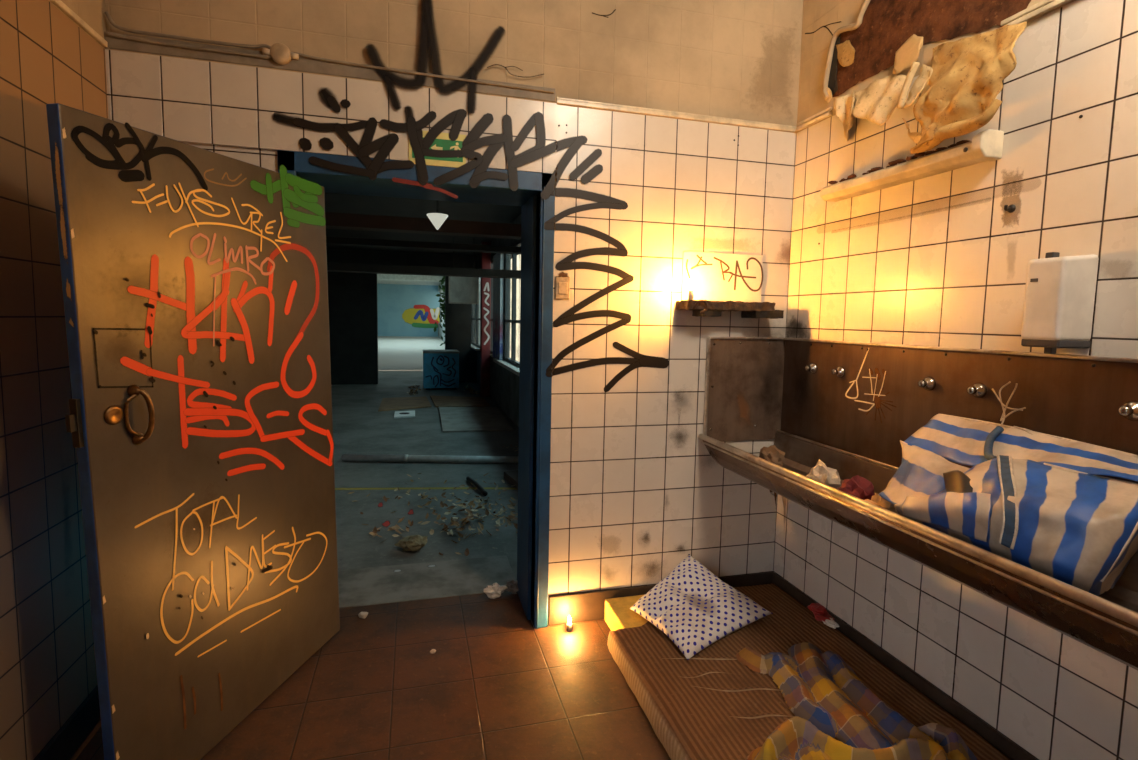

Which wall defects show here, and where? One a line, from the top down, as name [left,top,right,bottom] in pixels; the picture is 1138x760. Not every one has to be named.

peeling [822,0,1031,184]